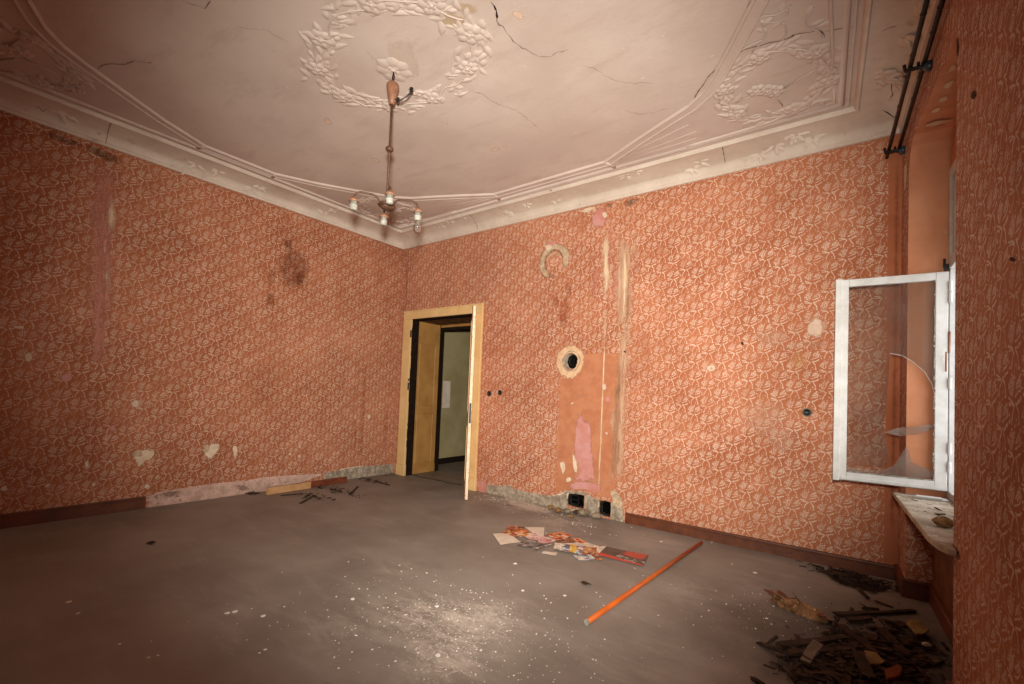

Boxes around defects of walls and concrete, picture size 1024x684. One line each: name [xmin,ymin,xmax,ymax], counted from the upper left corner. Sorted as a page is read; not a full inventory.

crack [491,2,565,57]
peeling [807,318,822,337]
spalling [556,345,584,379]
peeling [131,449,155,467]
flaking render [144,443,393,507]
flaking render [477,415,623,522]